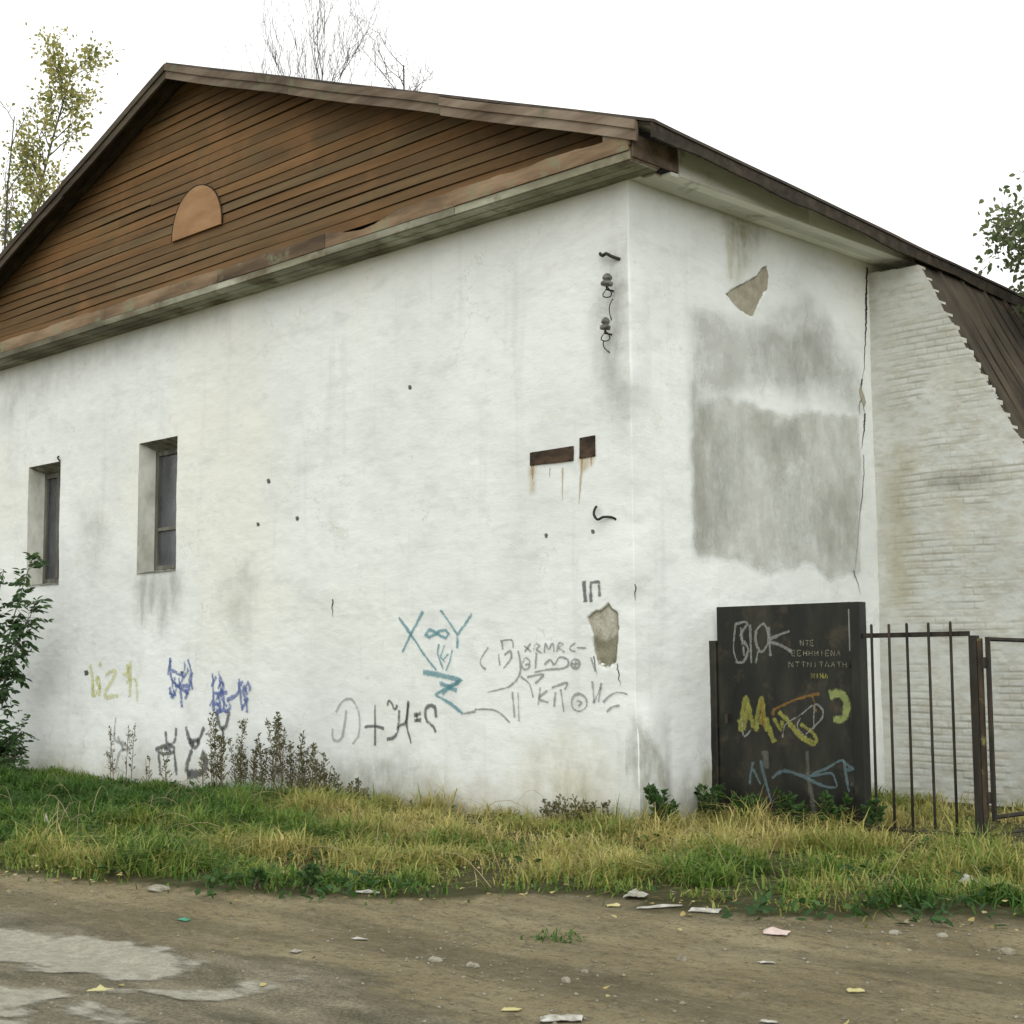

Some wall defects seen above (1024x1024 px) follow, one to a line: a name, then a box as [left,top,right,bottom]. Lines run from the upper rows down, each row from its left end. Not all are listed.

spalling [726,266,768,316]
crack [853,267,868,590]
spalling [588,603,619,668]